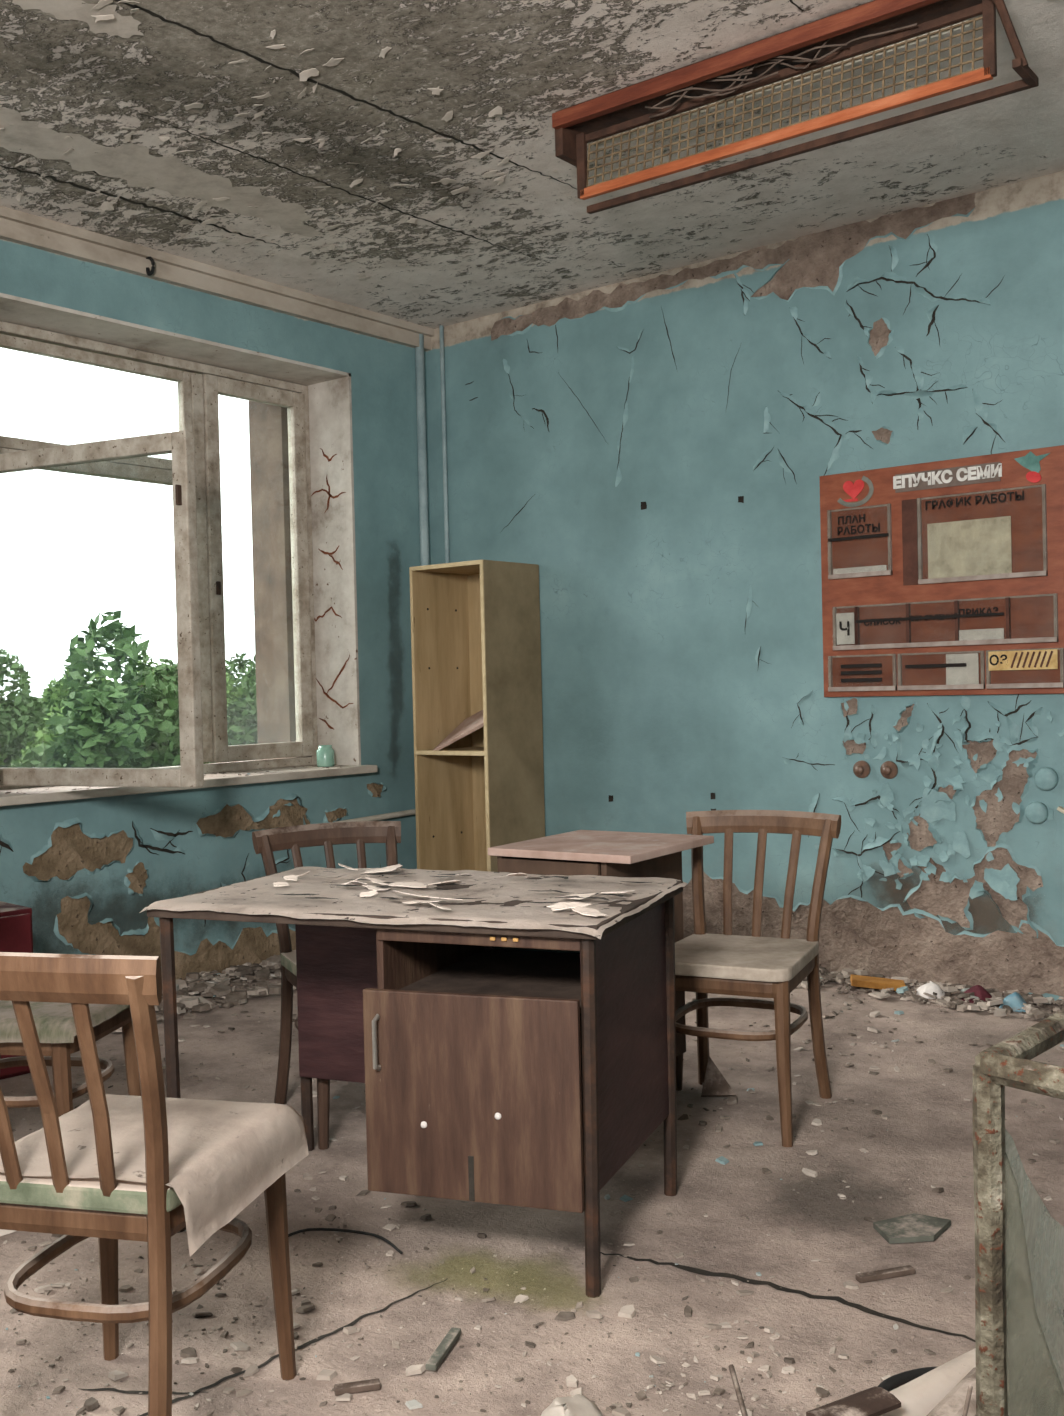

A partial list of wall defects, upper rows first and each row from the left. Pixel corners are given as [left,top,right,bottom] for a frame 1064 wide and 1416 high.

peeling [12,0,144,38]
peeling [0,105,343,265]
peeling [235,30,285,152]
peeling [297,48,344,99]
peeling [431,178,469,204]
peeling [432,111,512,185]
peeling [471,106,502,127]
peeling [841,697,859,718]
peeling [196,793,348,839]
peeling [683,702,1064,997]
peeling [23,817,296,980]
crack [600,1252,975,1342]